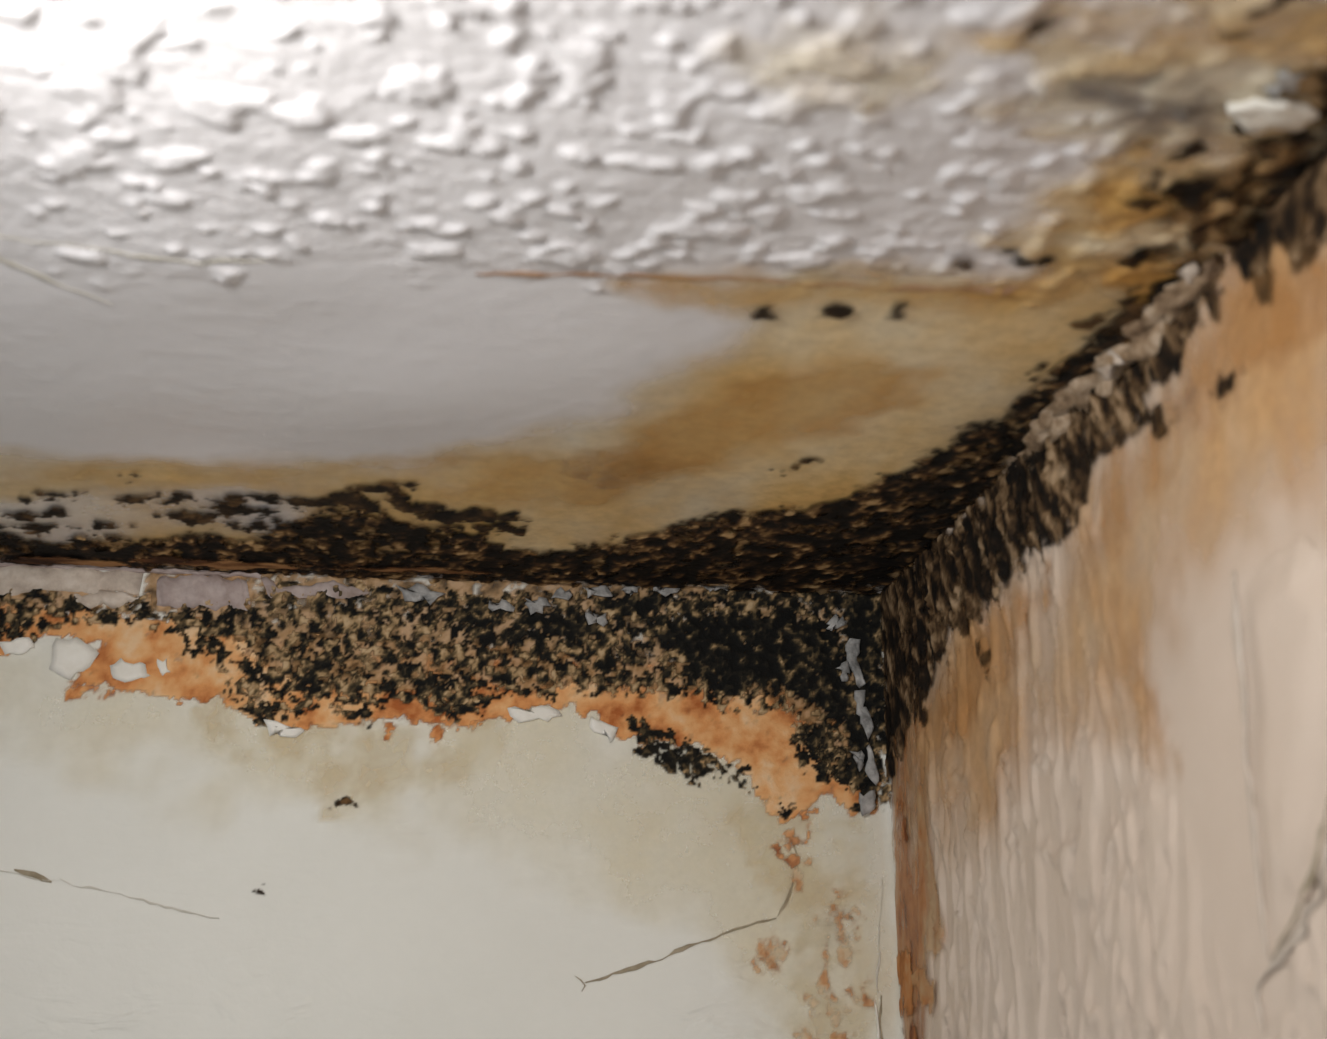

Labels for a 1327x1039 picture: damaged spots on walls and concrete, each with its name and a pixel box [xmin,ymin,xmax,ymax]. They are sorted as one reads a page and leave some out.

crack [0,236,269,304]
damp [0,0,1327,827]
peeling [0,563,884,844]
crack [0,869,219,919]
crack [575,845,797,992]